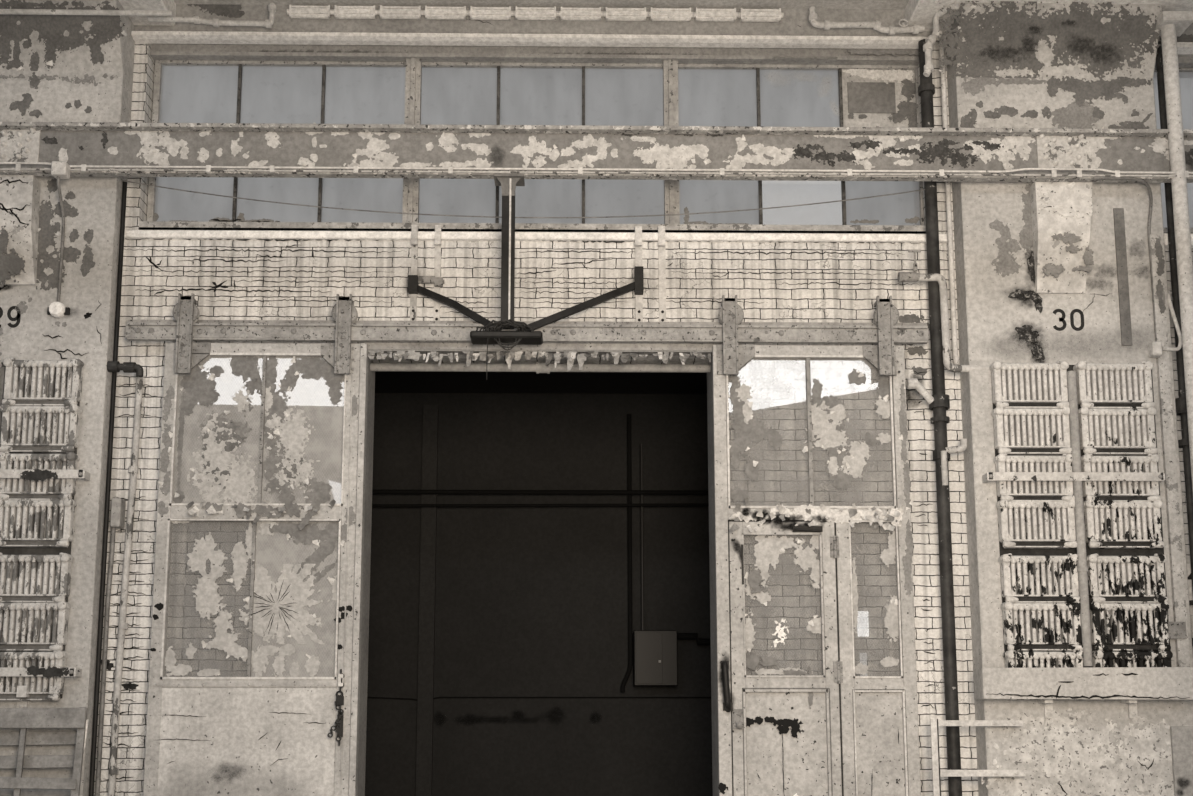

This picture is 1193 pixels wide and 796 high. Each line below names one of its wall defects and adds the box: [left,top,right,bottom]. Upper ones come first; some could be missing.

peeling [0,0,127,119]
peeling [935,0,1170,173]
peeling [58,148,68,162]
peeling [124,130,281,166]
peeling [298,122,494,170]
peeling [510,134,796,172]
crack [0,179,29,224]
peeling [899,312,930,329]
peeling [150,356,359,677]
peeling [728,344,930,675]
peeling [746,716,803,738]